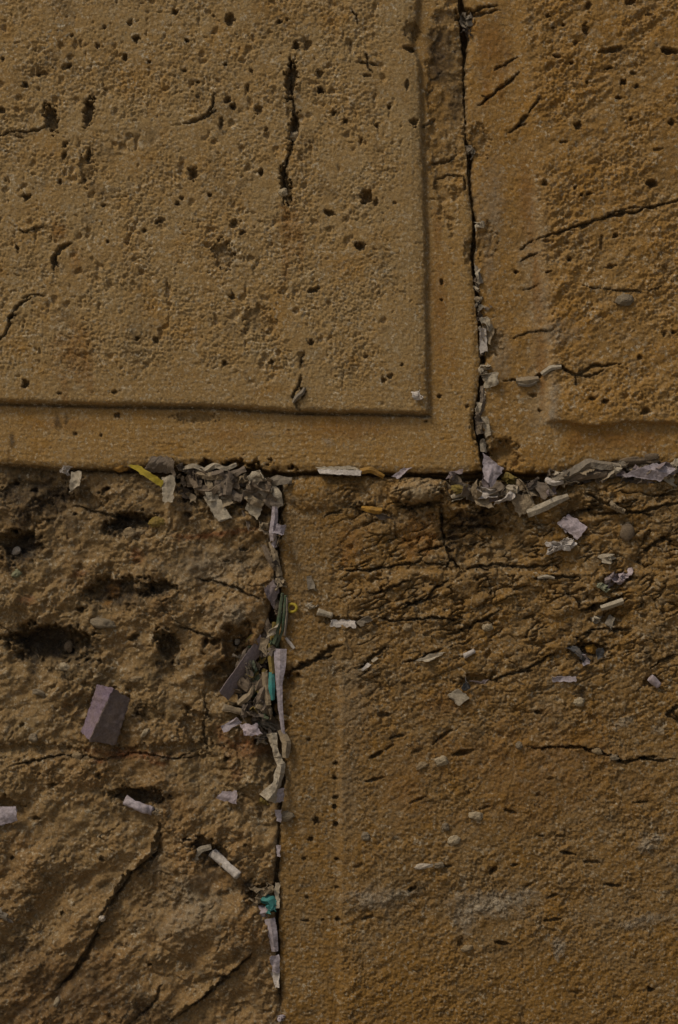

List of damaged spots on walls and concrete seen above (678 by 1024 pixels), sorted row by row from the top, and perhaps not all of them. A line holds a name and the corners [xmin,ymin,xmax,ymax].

crack [478,58,519,106]
crack [185,93,216,124]
crack [510,98,540,134]
crack [524,200,678,259]
crack [0,294,45,341]
crack [598,491,678,551]
crack [290,501,632,673]
crack [487,654,554,683]
crack [18,693,212,765]
crack [665,705,678,723]
crack [531,745,670,765]
crack [56,822,164,989]